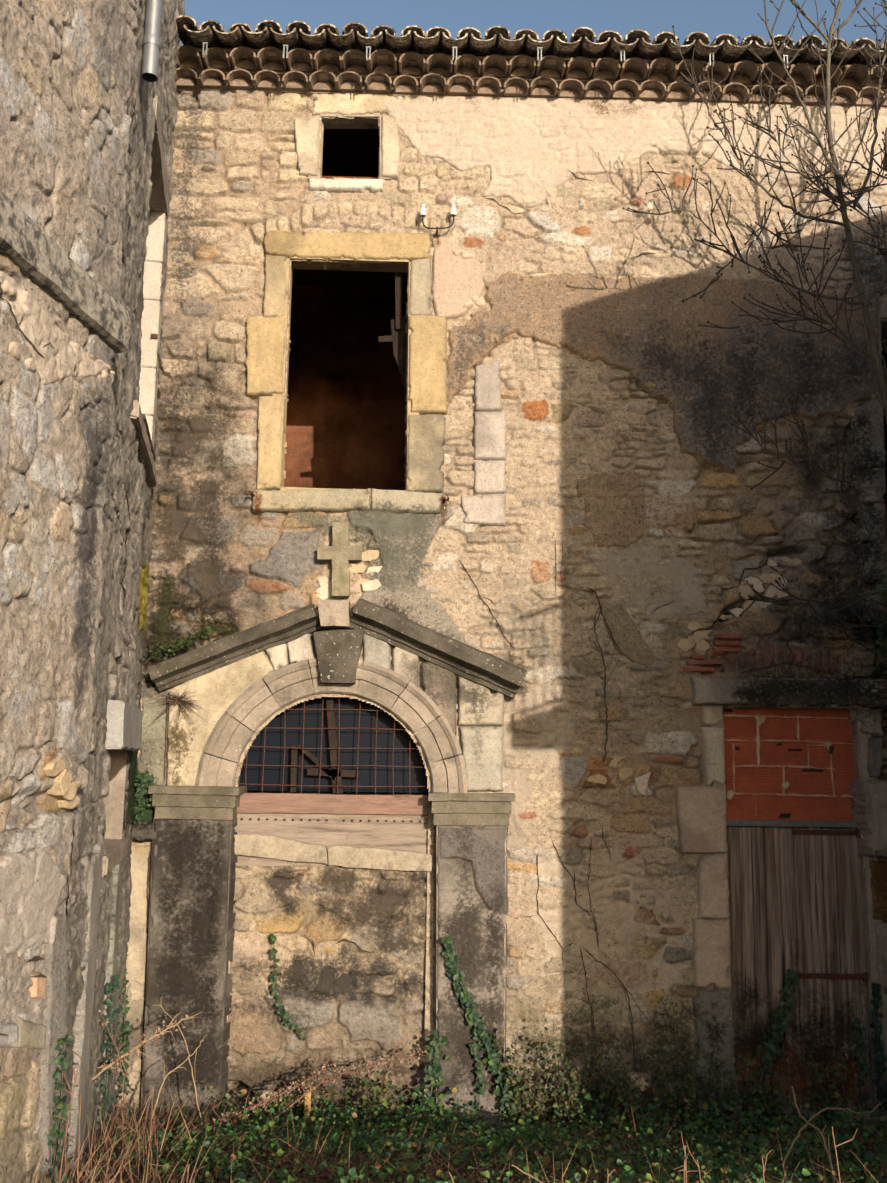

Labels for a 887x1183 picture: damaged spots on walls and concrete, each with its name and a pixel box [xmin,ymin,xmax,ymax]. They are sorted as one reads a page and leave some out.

flaking render [383,96,887,212]
flaking render [446,271,882,474]
leakage [643,348,865,446]
leakage [137,367,240,668]
leakage [158,827,224,1089]
leakage [266,866,507,1094]
leakage [232,1062,424,1116]